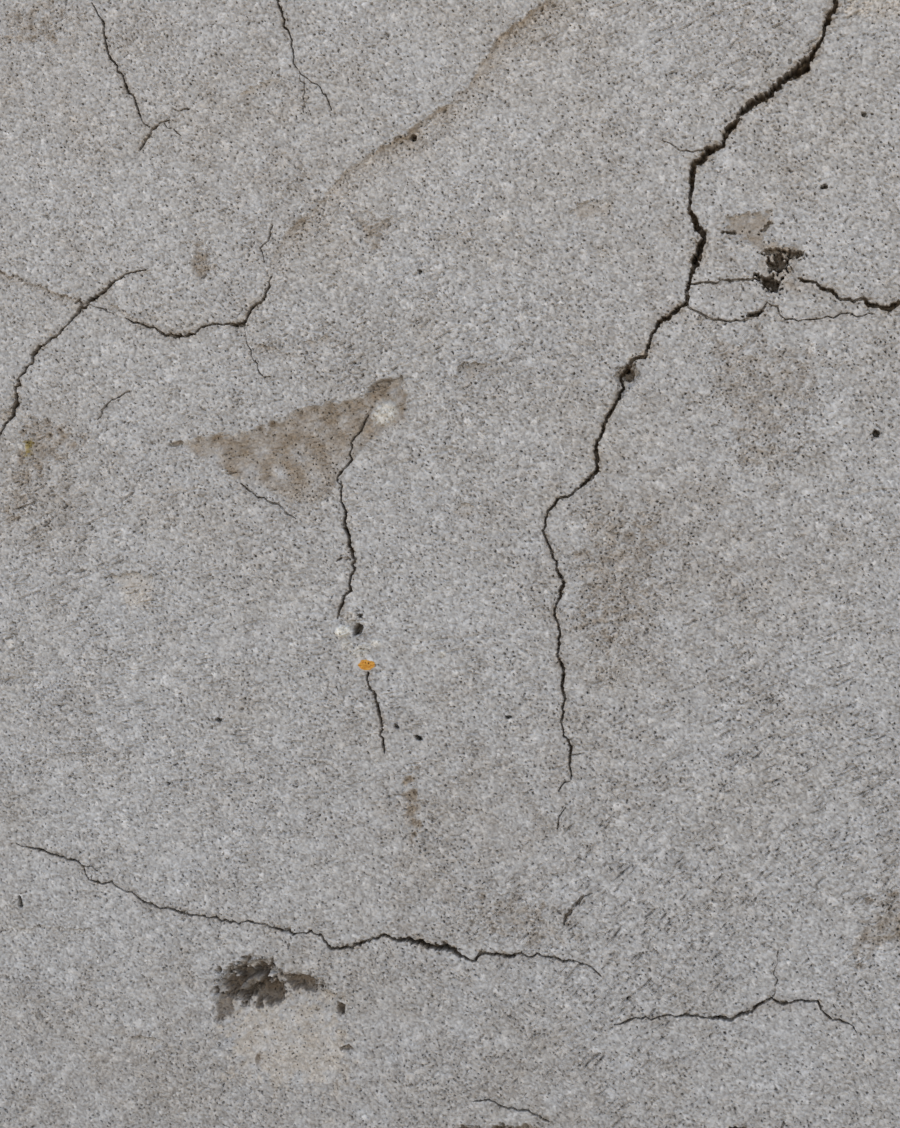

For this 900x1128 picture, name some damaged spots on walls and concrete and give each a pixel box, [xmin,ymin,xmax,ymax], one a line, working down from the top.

crack [90,0,191,153]
crack [275,0,334,114]
crack [0,224,275,437]
crack [239,481,297,521]
peeling [169,375,410,502]
crack [334,414,370,621]
crack [540,0,900,832]
crack [364,671,387,756]
crack [10,842,604,979]
spalling [211,954,356,1093]
crack [612,949,859,1034]
crack [727,1120,747,1128]